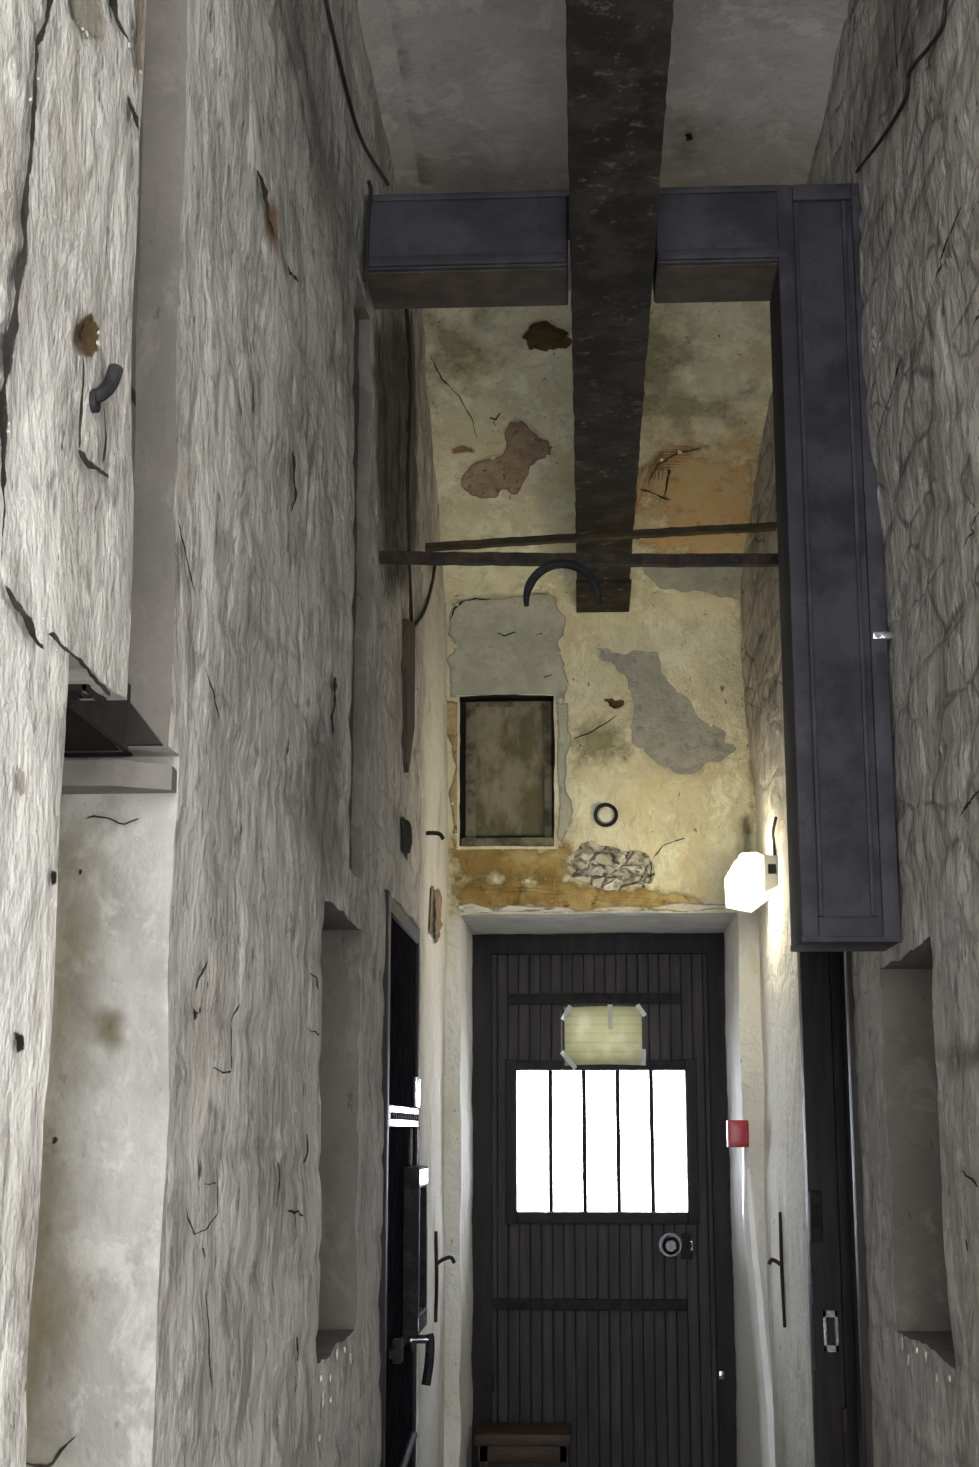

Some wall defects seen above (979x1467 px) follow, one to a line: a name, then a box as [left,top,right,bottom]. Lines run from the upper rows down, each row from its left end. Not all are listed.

flaking render [71,0,106,40]
crack [109,0,131,48]
crack [0,0,110,696]
flaking render [76,313,101,358]
flaking render [523,321,572,354]
flaking render [461,420,552,498]
peeling [429,593,736,943]
leakage [449,839,702,913]